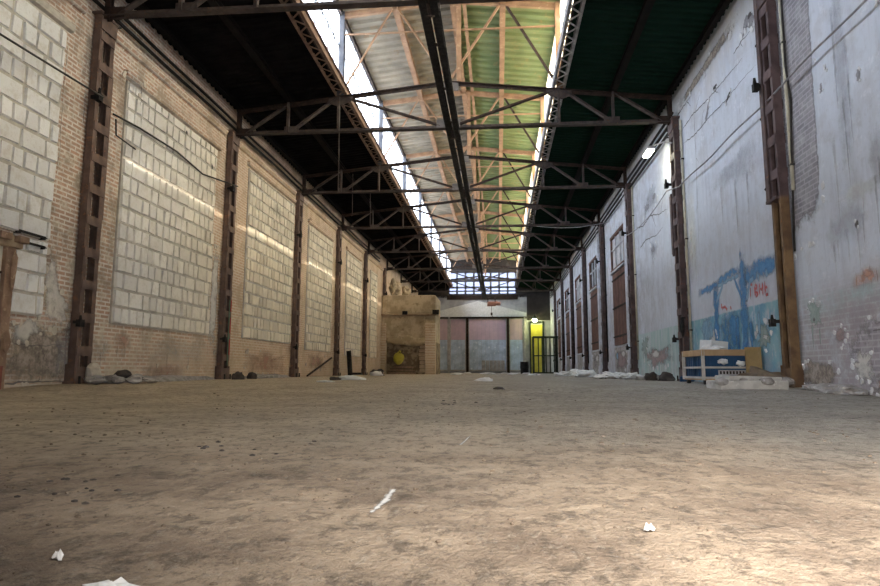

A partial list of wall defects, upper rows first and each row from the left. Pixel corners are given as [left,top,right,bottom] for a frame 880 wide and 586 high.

flaking render [9,247,71,346]
flaking render [802,315,880,397]